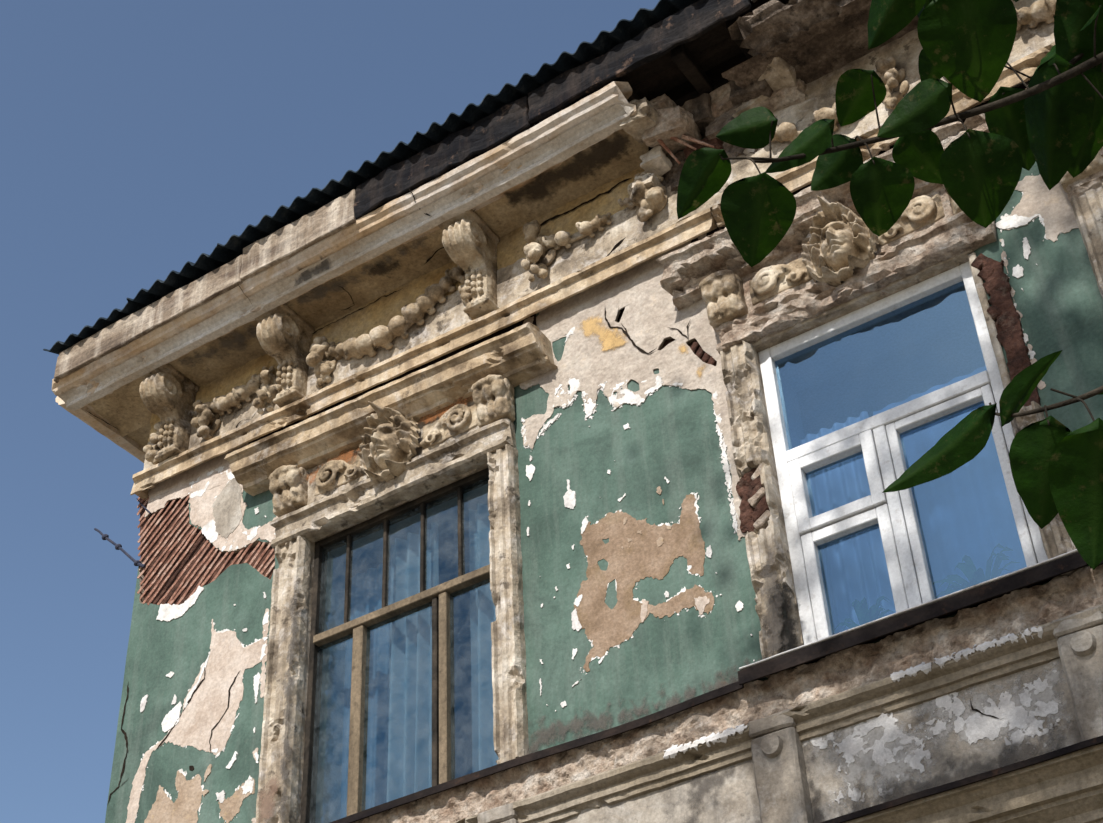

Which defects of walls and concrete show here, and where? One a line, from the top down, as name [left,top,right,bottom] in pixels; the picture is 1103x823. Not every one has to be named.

damp [505,133,630,207]
crack [540,178,632,226]
crack [604,310,691,354]
peeling [971,175,1079,381]
peeling [519,259,770,541]
spalling [1023,380,1046,407]
peeling [145,443,278,552]
peeling [571,492,722,687]
crack [107,685,129,805]
peeling [126,592,270,823]
peeling [803,662,1068,812]